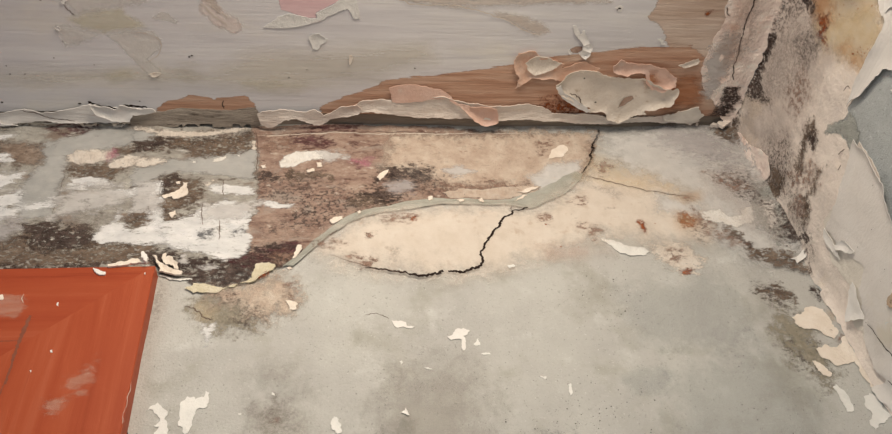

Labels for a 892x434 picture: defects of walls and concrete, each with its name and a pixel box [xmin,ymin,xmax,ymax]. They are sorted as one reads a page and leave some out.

crack [727,0,755,101]
damp [599,0,878,274]
damp [0,123,442,337]
crack [336,207,528,277]
peeling [147,391,209,434]
damp [753,281,833,391]
peeling [792,306,891,430]